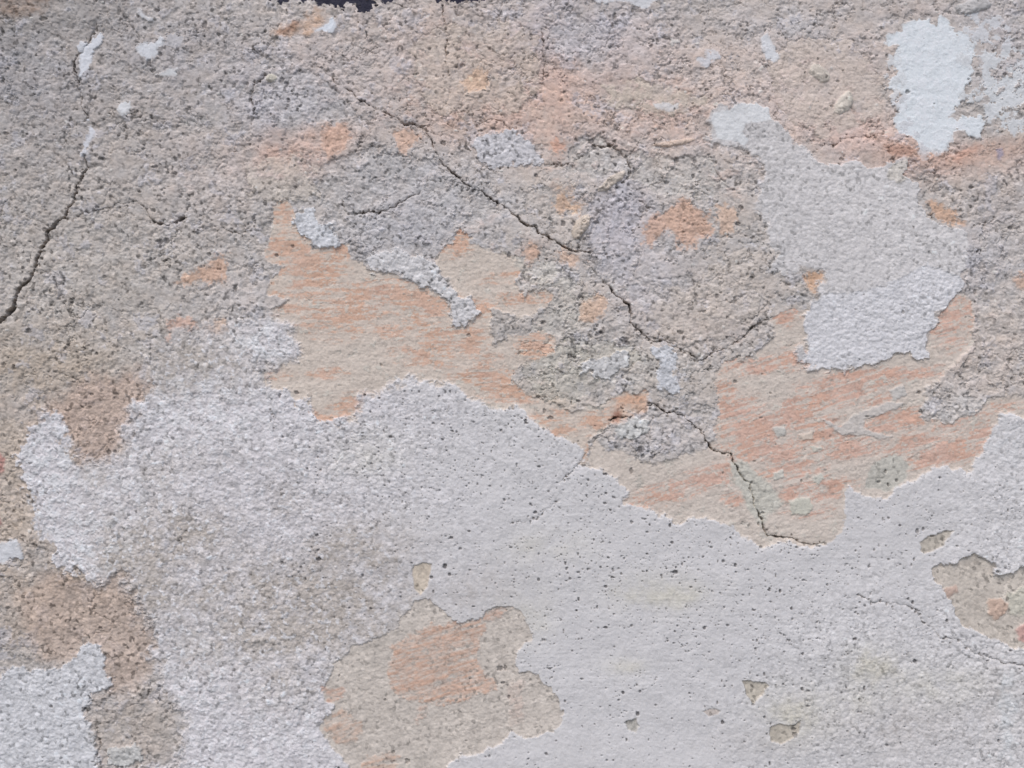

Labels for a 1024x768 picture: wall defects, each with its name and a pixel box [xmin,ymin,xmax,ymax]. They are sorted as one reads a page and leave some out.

crack [73,22,98,119]
crack [0,154,257,324]
crack [308,52,774,369]
peeling [264,101,1024,549]
peeling [0,416,36,565]
peeling [0,570,159,768]
peeling [46,364,156,466]
peeling [320,563,564,768]
crack [509,403,825,548]
spalling [921,531,955,554]
peeling [931,554,1024,650]